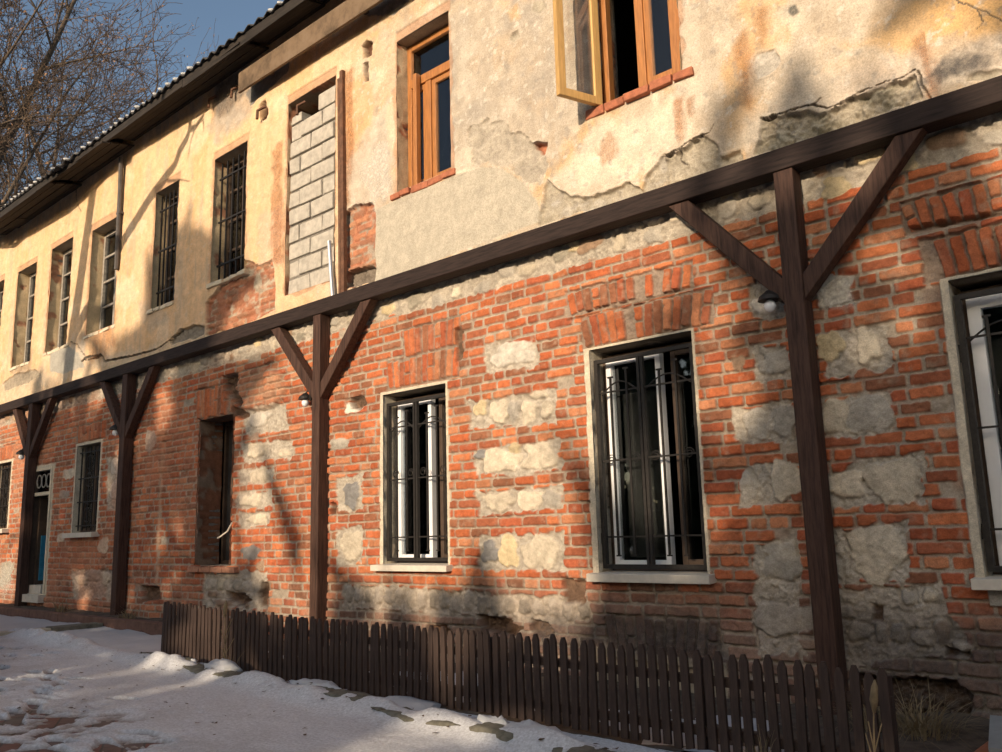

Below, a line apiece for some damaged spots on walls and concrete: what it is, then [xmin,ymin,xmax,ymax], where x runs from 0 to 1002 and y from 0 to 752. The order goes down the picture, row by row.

crack [957,0,1002,29]
spalling [748,45,784,82]
spalling [961,65,1002,85]
spalling [462,69,932,228]
spalling [347,199,376,290]
spalling [168,256,278,347]
crack [71,331,184,362]
spalling [1,368,42,392]